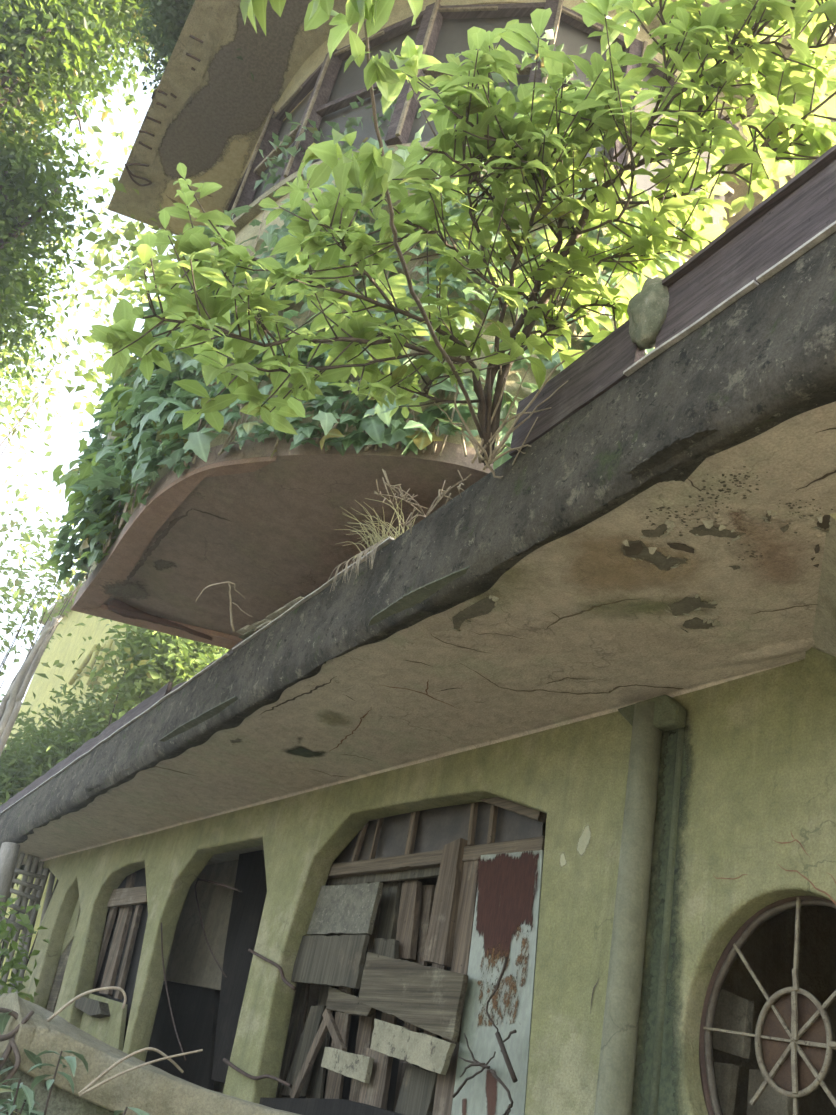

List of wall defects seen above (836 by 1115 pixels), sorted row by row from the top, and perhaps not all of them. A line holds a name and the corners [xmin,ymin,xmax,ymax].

spalling [125,31,252,235]
crack [796,470,836,491]
spalling [448,595,499,632]
crack [383,598,684,709]
spalling [664,594,720,633]
crack [260,676,375,777]
corrosion [474,850,539,1027]
corrosion [485,1069,497,1115]